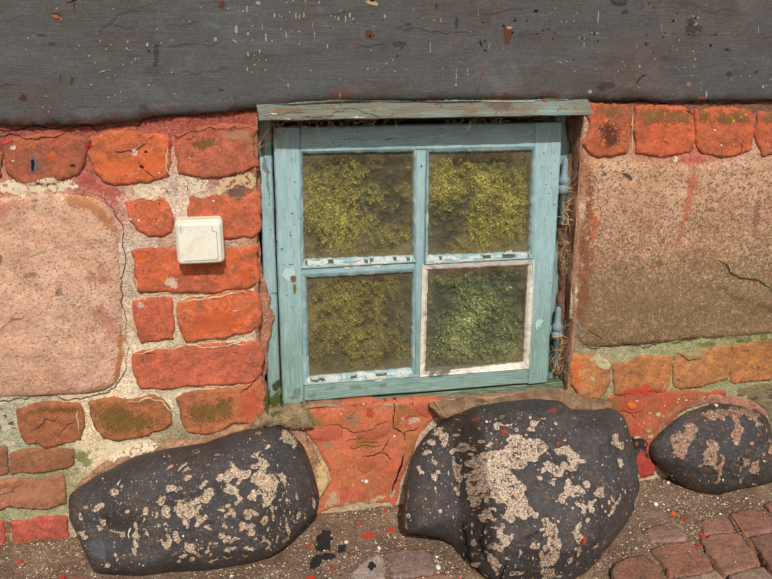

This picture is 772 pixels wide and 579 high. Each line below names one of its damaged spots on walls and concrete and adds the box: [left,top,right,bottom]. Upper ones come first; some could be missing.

peeling [0,177,79,199]
peeling [305,255,412,270]
peeling [426,250,530,263]
crack [718,260,772,291]
peeling [305,370,412,384]
crack [323,397,419,493]